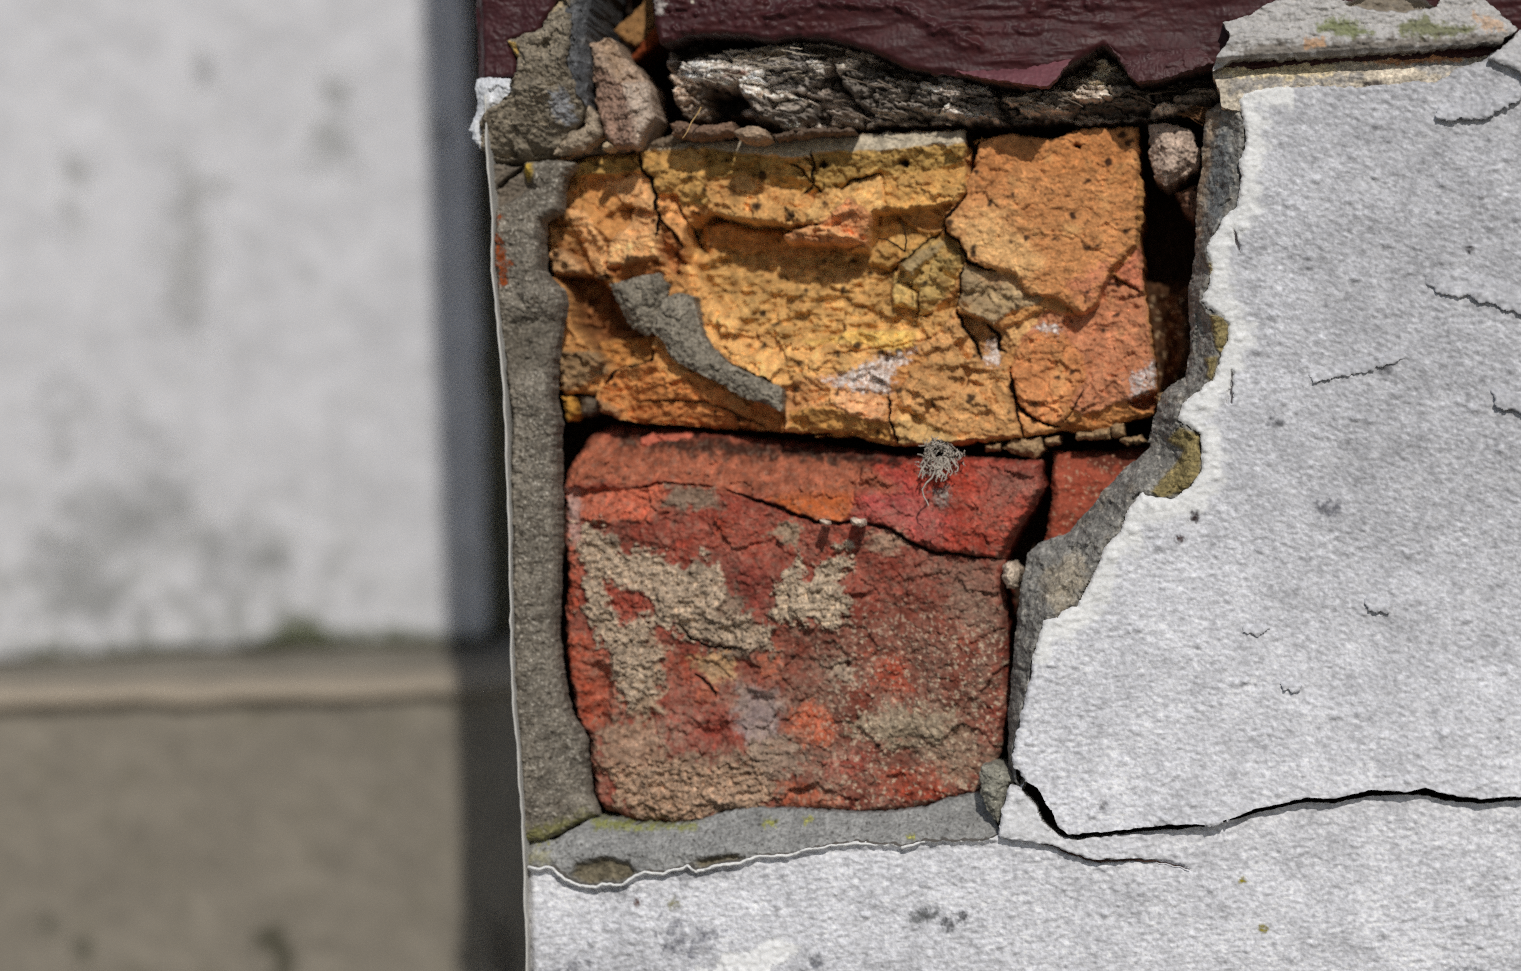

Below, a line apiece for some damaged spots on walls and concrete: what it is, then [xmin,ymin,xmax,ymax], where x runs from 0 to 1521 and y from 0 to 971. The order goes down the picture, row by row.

peeling [469,77,512,149]
crack [639,153,709,254]
crack [788,151,880,195]
crack [882,132,1083,443]
crack [605,359,763,426]
spalling [528,0,1521,889]
crack [1025,783,1199,870]
crack [1237,788,1519,817]